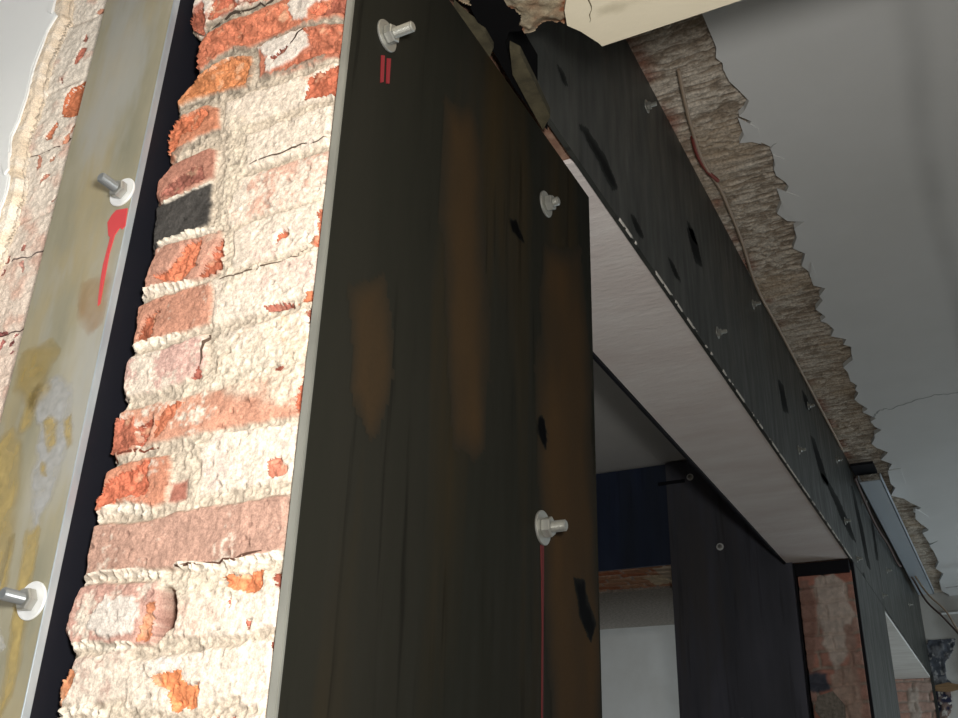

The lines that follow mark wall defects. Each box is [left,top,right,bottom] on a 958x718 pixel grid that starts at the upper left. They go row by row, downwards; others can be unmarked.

crack [208,0,274,32]
spalling [504,0,567,33]
peeling [0,0,88,276]
crack [250,136,326,164]
spalling [626,13,942,593]
crack [174,550,262,567]